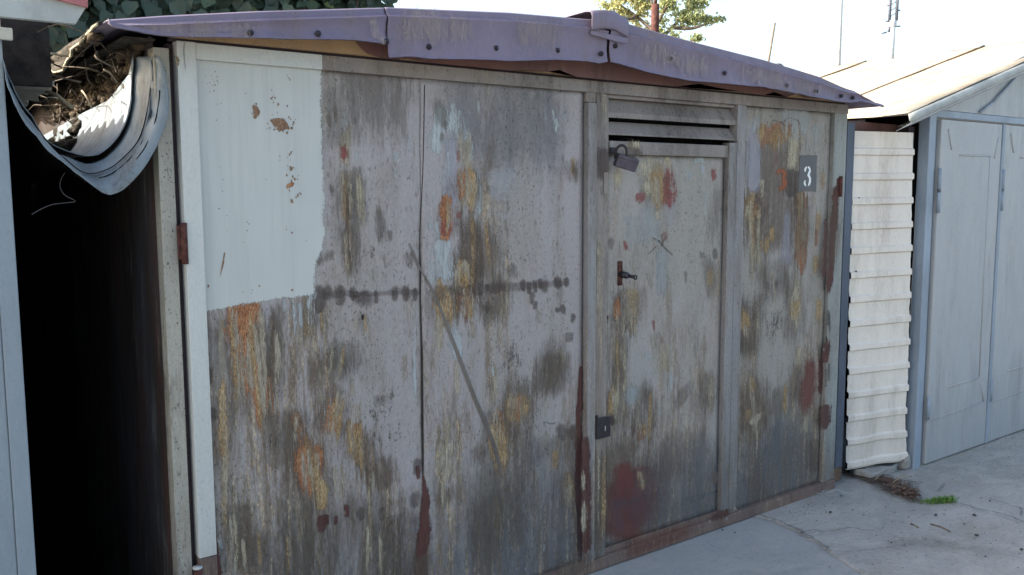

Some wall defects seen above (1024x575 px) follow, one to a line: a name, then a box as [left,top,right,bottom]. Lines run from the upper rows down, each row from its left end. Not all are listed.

rust [252,90,296,134]
rust [216,285,281,525]
rust [433,130,490,354]
rust [520,277,569,294]
rust [552,288,637,557]
rust [743,117,839,330]
rust [797,338,832,435]